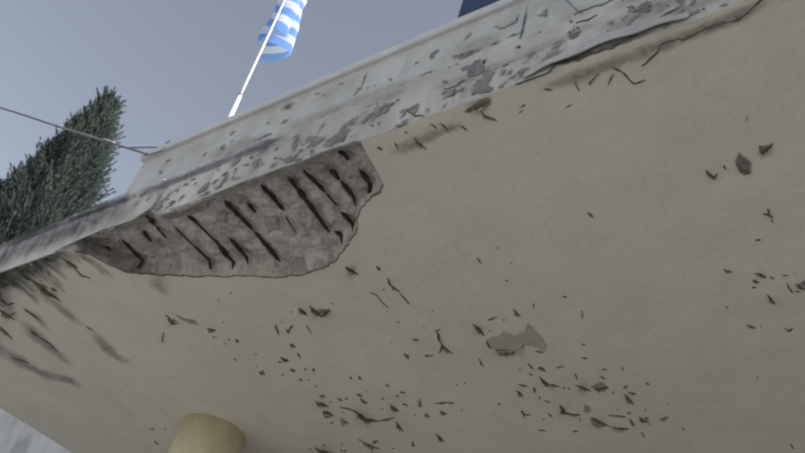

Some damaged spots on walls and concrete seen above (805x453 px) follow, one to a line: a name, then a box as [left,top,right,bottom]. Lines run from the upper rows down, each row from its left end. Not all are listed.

crack [574,0,612,24]
peeling [600,0,705,43]
crack [724,0,763,24]
peeling [438,20,582,121]
crack [515,30,701,85]
spalling [55,75,429,278]
peeling [736,154,751,174]
peeling [291,303,333,333]
peeling [473,317,545,358]
peeling [279,357,408,431]
peeling [516,364,614,403]
peeling [542,386,651,437]